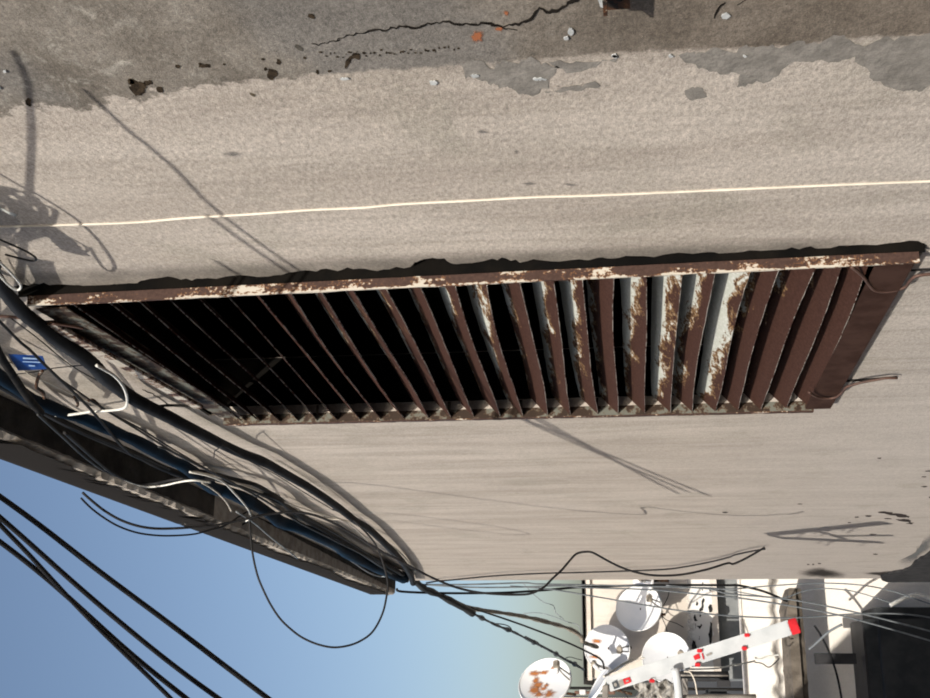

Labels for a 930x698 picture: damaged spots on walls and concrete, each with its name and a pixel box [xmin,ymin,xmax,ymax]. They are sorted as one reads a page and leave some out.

crack [312,0,579,46]
spalling [127,79,163,98]
spalling [261,58,281,80]
spalling [316,46,459,80]
peeling [461,53,618,96]
peeling [685,87,706,101]
peeling [668,33,930,92]